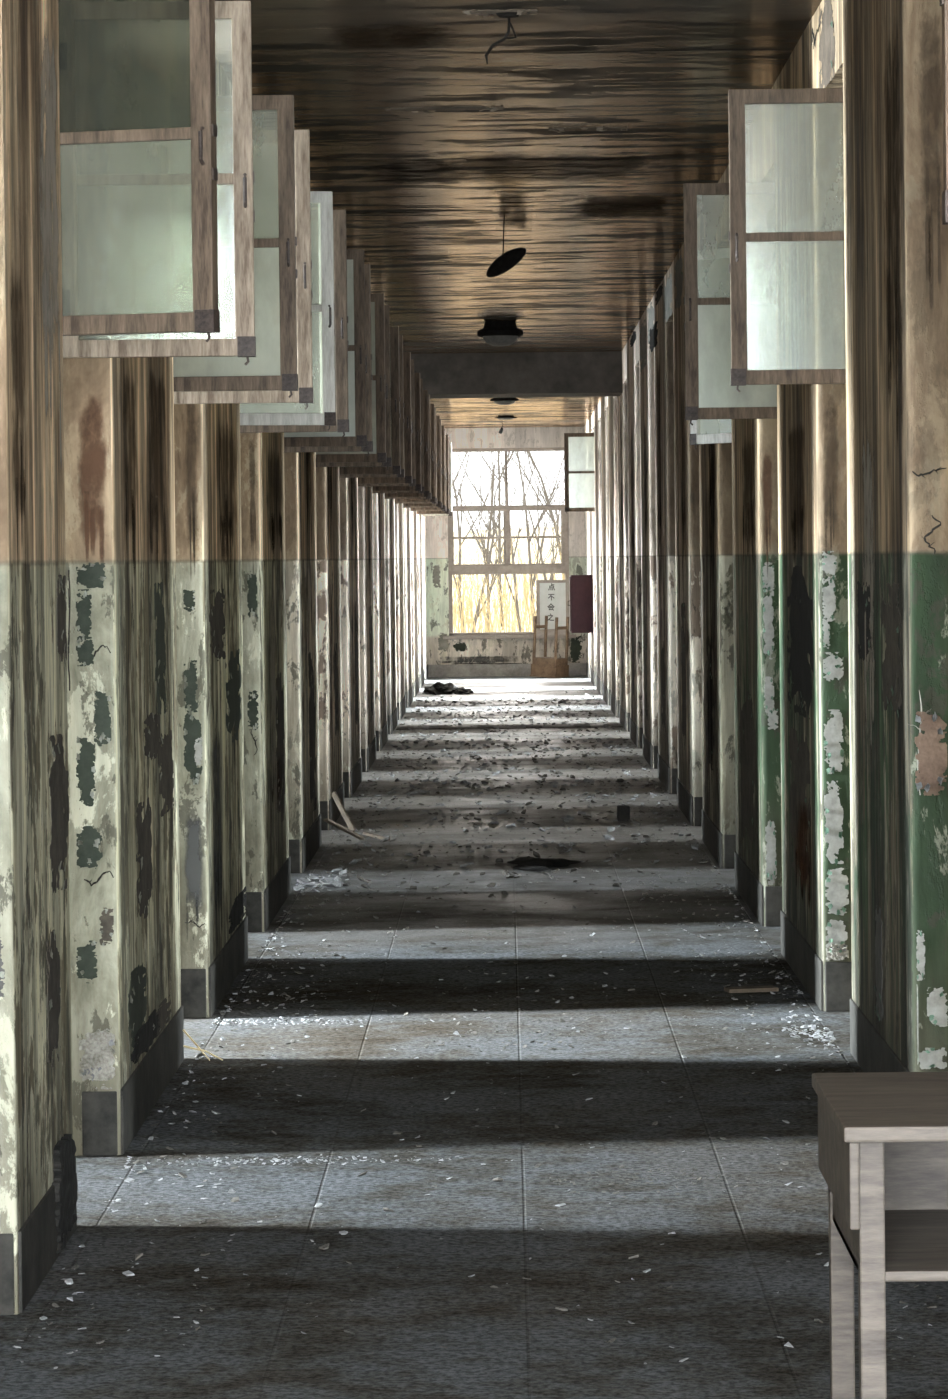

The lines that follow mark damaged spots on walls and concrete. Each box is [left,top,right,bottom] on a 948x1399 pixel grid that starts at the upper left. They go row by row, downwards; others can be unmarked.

peeling [56,562,106,666]
peeling [247,571,258,618]
peeling [49,691,111,893]
peeling [136,582,259,919]
peeling [276,666,285,822]
peeling [740,551,948,961]
peeling [916,930,948,1069]